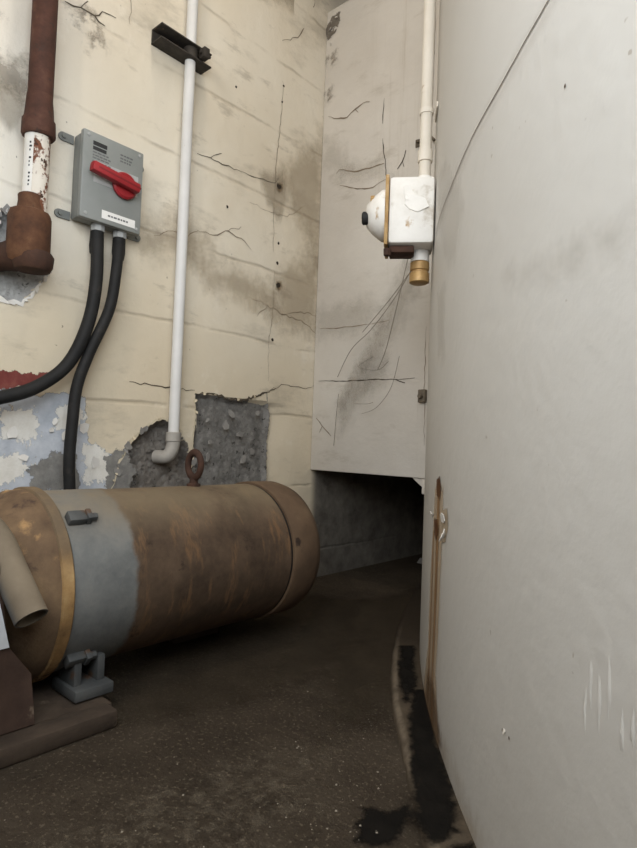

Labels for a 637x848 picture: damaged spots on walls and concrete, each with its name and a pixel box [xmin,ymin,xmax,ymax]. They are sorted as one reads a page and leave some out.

crack [65,0,132,26]
flaking render [0,204,10,242]
flaking render [0,271,48,307]
peeling [0,370,48,390]
peeling [0,392,69,492]
flaking render [75,388,276,489]
rust [424,476,443,746]